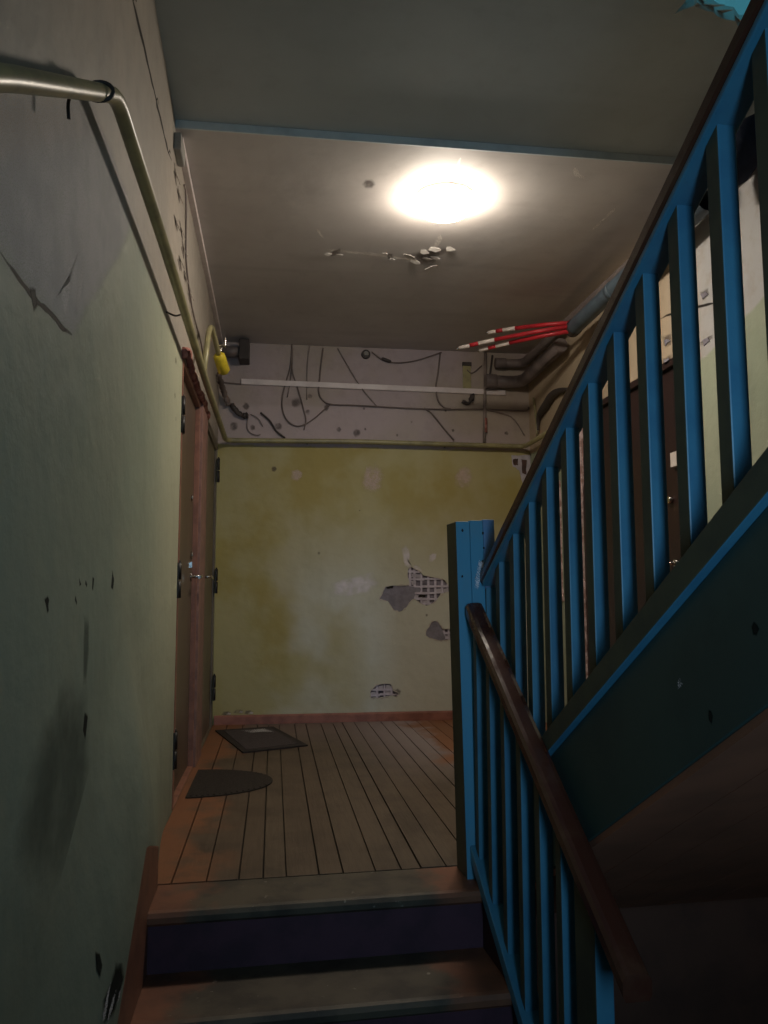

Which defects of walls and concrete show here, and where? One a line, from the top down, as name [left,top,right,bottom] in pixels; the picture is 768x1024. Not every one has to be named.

crack [133,0,171,156]
spalling [382,247,455,270]
spalling [379,567,449,612]
spalling [425,620,450,641]